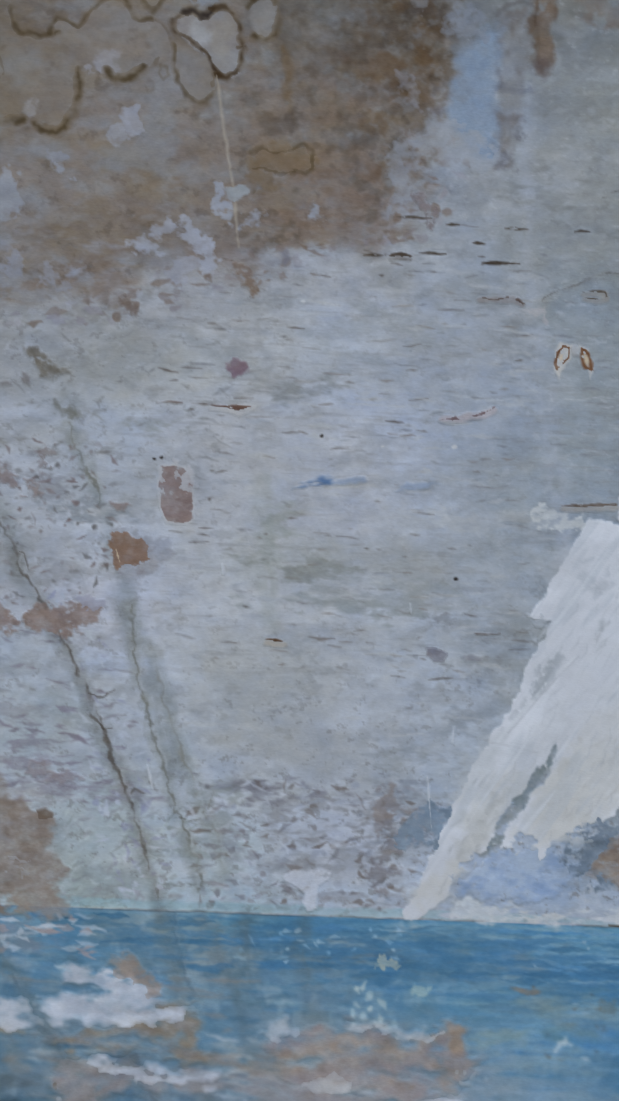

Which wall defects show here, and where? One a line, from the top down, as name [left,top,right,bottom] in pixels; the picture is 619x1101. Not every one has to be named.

water stain [0,0,284,139]
water stain [243,139,321,201]
crack [54,416,108,509]
peeling [105,455,199,586]
peeling [0,591,119,641]
peeling [423,645,485,664]
crack [0,502,238,905]
peeling [0,755,87,925]
peeling [252,1012,495,1101]